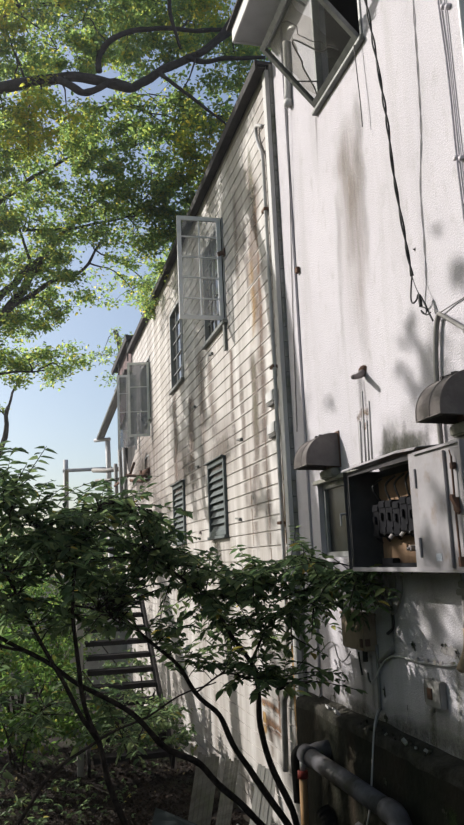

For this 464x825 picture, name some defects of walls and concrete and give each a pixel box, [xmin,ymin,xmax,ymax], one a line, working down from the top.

rust [250,177,263,330]
leakage [173,356,215,482]
leakage [240,361,259,479]
rust [259,344,272,559]